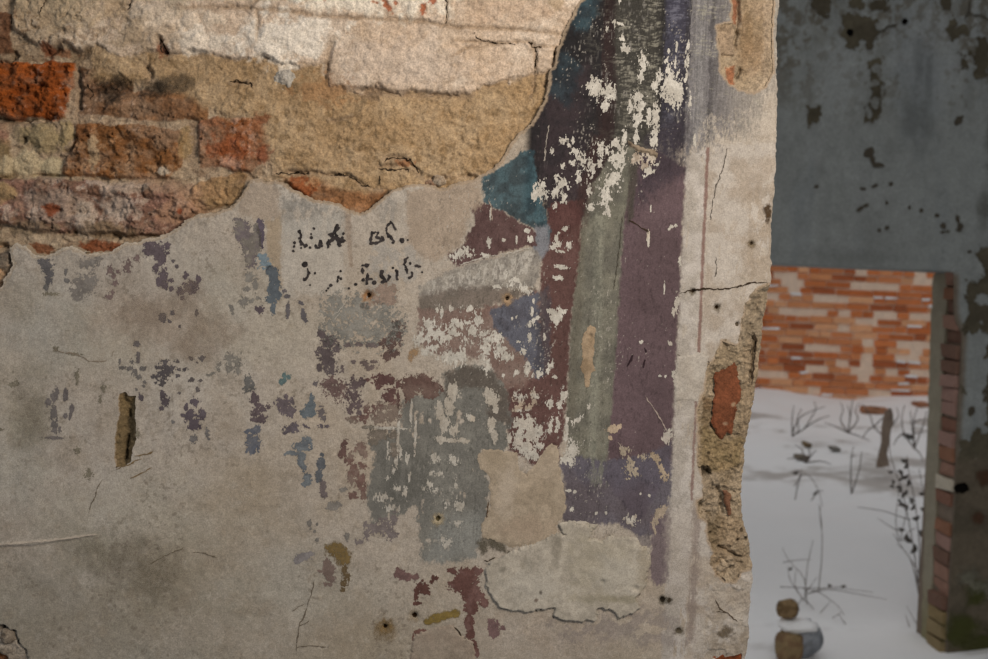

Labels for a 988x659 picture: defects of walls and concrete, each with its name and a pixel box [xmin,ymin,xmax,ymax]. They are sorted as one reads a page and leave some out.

spalling [0,0,580,300]
crack [474,32,542,75]
crack [710,149,727,218]
spalling [717,0,773,92]
peeling [806,105,822,128]
peeling [840,0,890,124]
crack [679,258,767,294]
peeling [961,247,988,359]
spalling [115,351,250,479]
peeling [313,271,591,551]
spalling [697,283,770,582]
peeling [948,375,988,653]